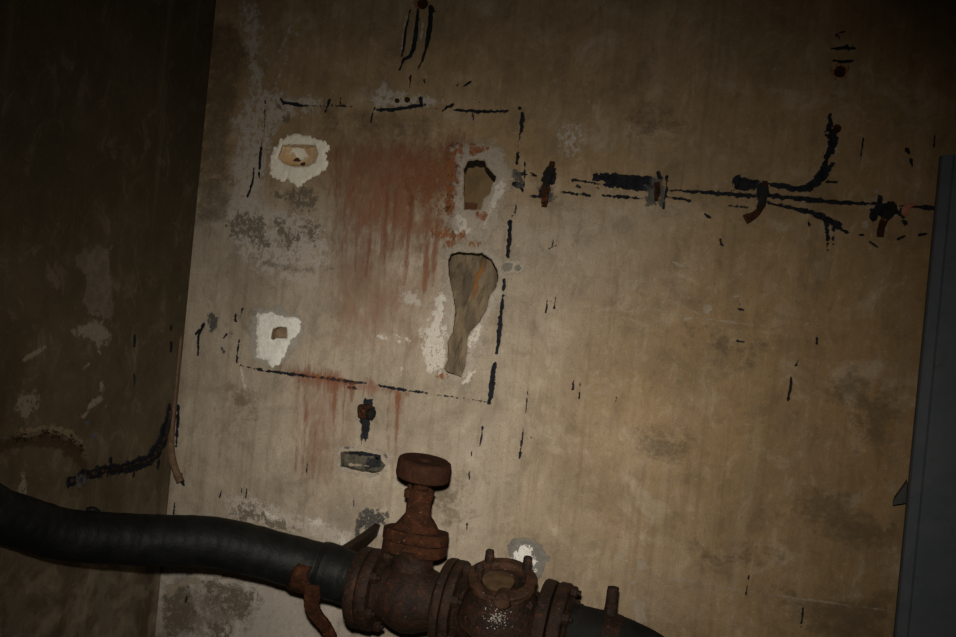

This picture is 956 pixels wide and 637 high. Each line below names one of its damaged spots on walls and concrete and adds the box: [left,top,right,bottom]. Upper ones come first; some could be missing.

spalling [418,140,515,391]